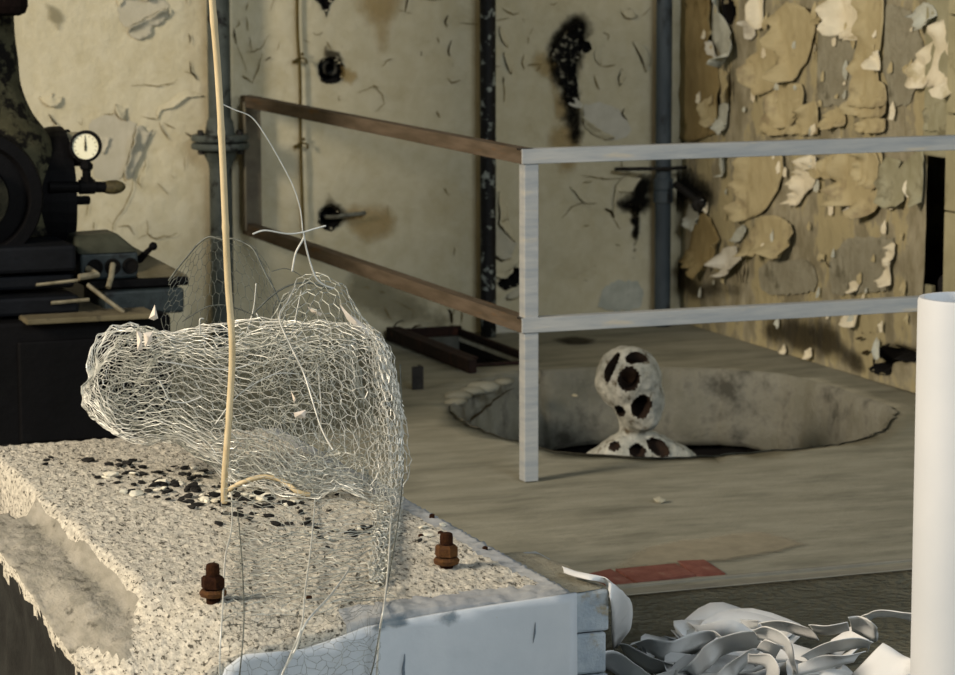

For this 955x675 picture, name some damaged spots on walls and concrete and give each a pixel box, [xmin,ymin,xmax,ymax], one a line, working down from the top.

flaking render [117,0,170,40]
crack [108,34,203,139]
peeling [678,0,952,142]
flaking render [89,115,153,181]
crack [109,161,185,239]
peeling [678,151,924,296]
peeling [838,315,857,328]
spalling [868,343,917,375]
peeling [101,467,139,479]
peeling [119,479,185,497]
peeling [190,466,302,516]